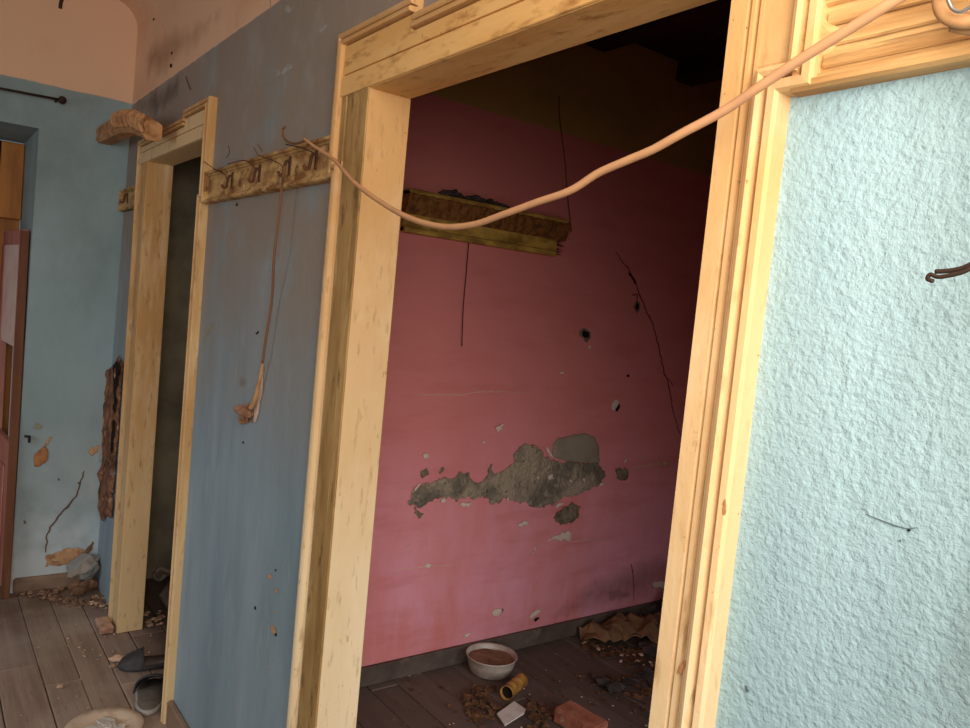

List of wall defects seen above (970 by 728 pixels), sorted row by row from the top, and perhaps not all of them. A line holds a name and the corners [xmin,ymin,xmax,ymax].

spalling [579,328,591,348]
peeling [34,436,52,467]
crack [45,471,84,553]
flaking render [88,356,123,521]
flaking render [408,433,628,525]
peeling [45,542,94,567]